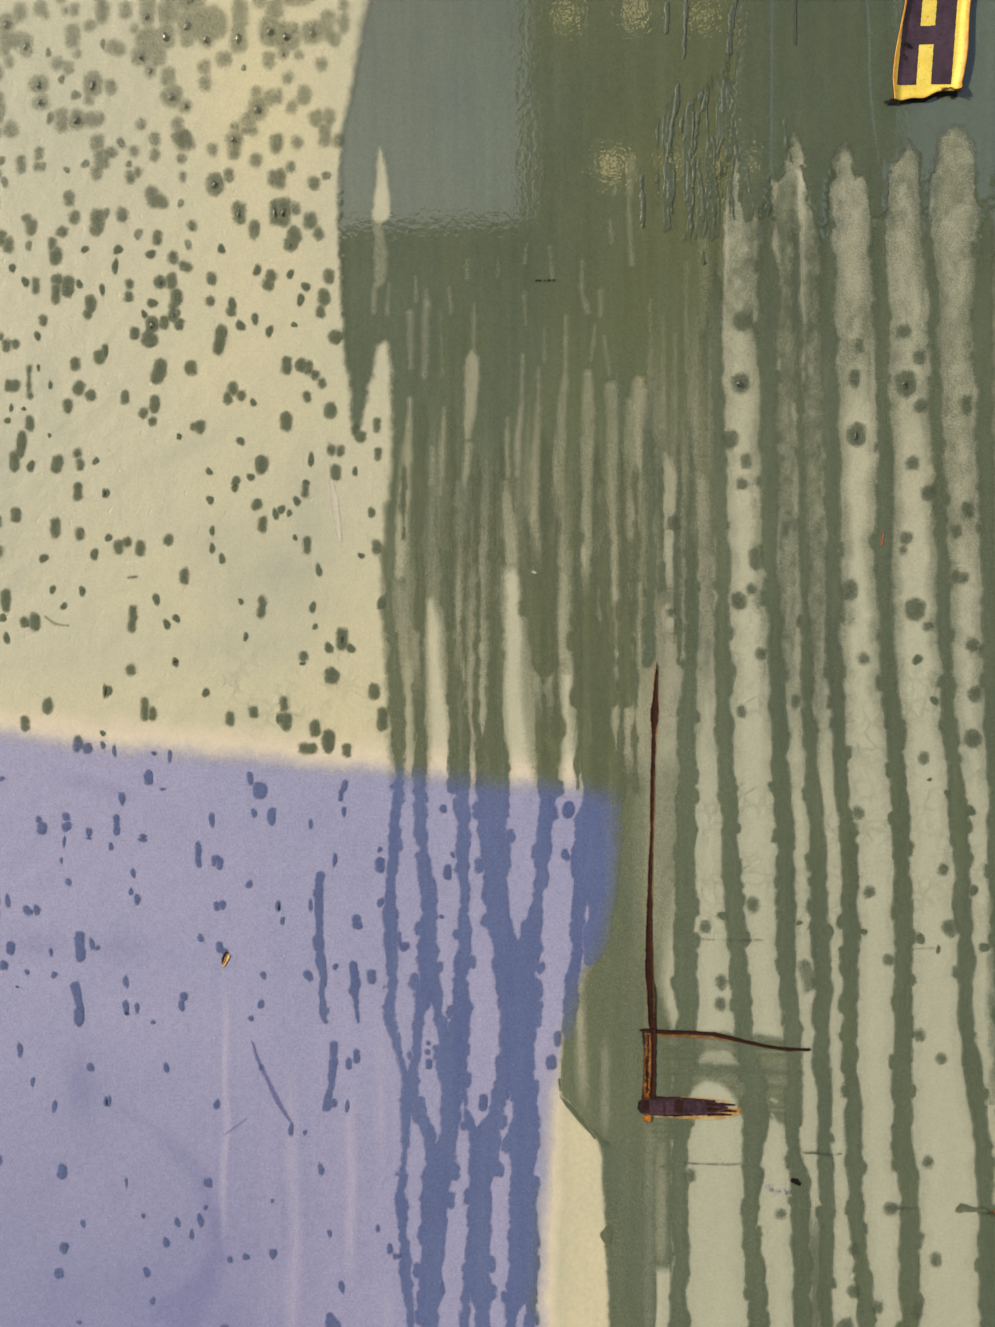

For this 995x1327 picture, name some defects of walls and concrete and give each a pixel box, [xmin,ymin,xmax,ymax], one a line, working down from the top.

damp [0,0,119,182]
damp [105,0,352,185]
damp [119,229,236,427]
damp [62,344,109,414]
damp [280,355,328,403]
damp [3,364,36,473]
damp [49,446,85,501]
damp [112,535,146,558]
damp [0,588,41,632]
damp [307,0,995,1327]
damp [19,696,54,732]
damp [278,695,353,760]